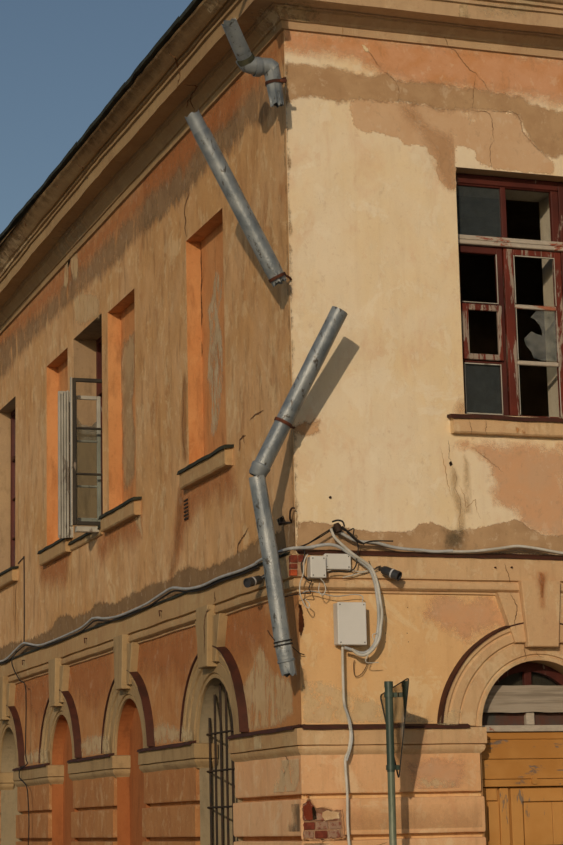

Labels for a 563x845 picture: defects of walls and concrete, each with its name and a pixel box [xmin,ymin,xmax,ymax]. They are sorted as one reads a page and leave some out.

peeling [146,130,195,190]
peeling [265,0,563,189]
crack [444,37,538,167]
peeling [275,442,563,577]
crack [442,442,479,524]
peeling [0,537,263,660]
flaking render [300,798,346,843]